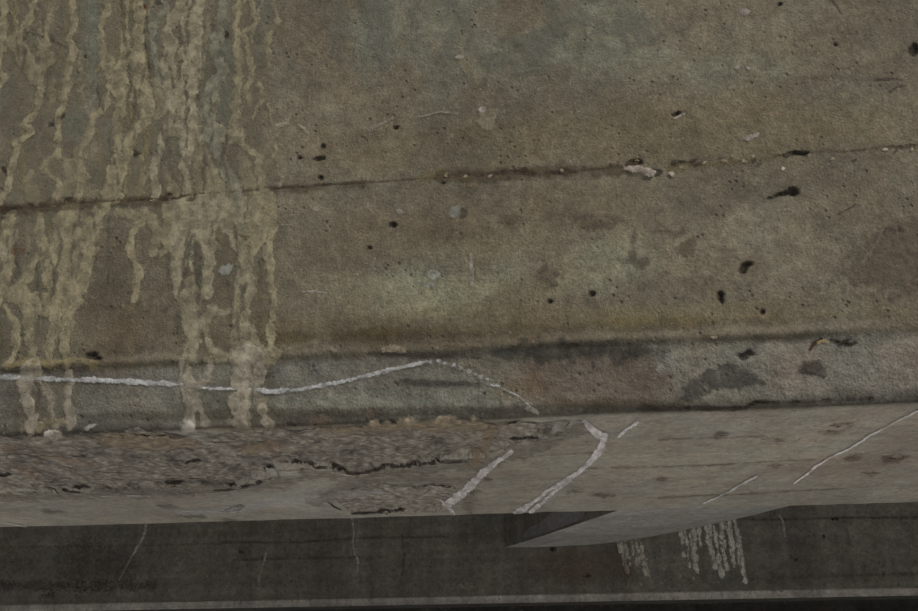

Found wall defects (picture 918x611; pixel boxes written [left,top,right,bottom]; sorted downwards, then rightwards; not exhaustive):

crack [668,144,916,171]
crack [0,166,622,215]
damp [0,0,283,437]
damp [682,363,765,401]
spalling [0,406,569,515]
efflorescence [617,539,664,586]
efflorescence [678,519,748,584]